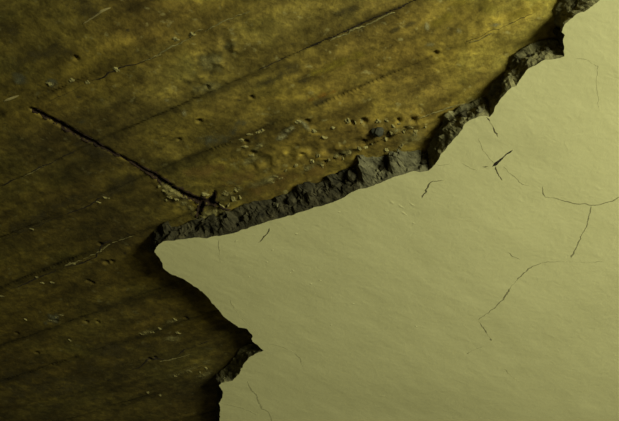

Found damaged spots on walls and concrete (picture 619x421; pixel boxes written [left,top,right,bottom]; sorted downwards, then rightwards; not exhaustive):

crack [1,11,250,219]
flaking render [148,0,599,252]
crack [464,140,619,354]
flaking render [187,333,263,421]